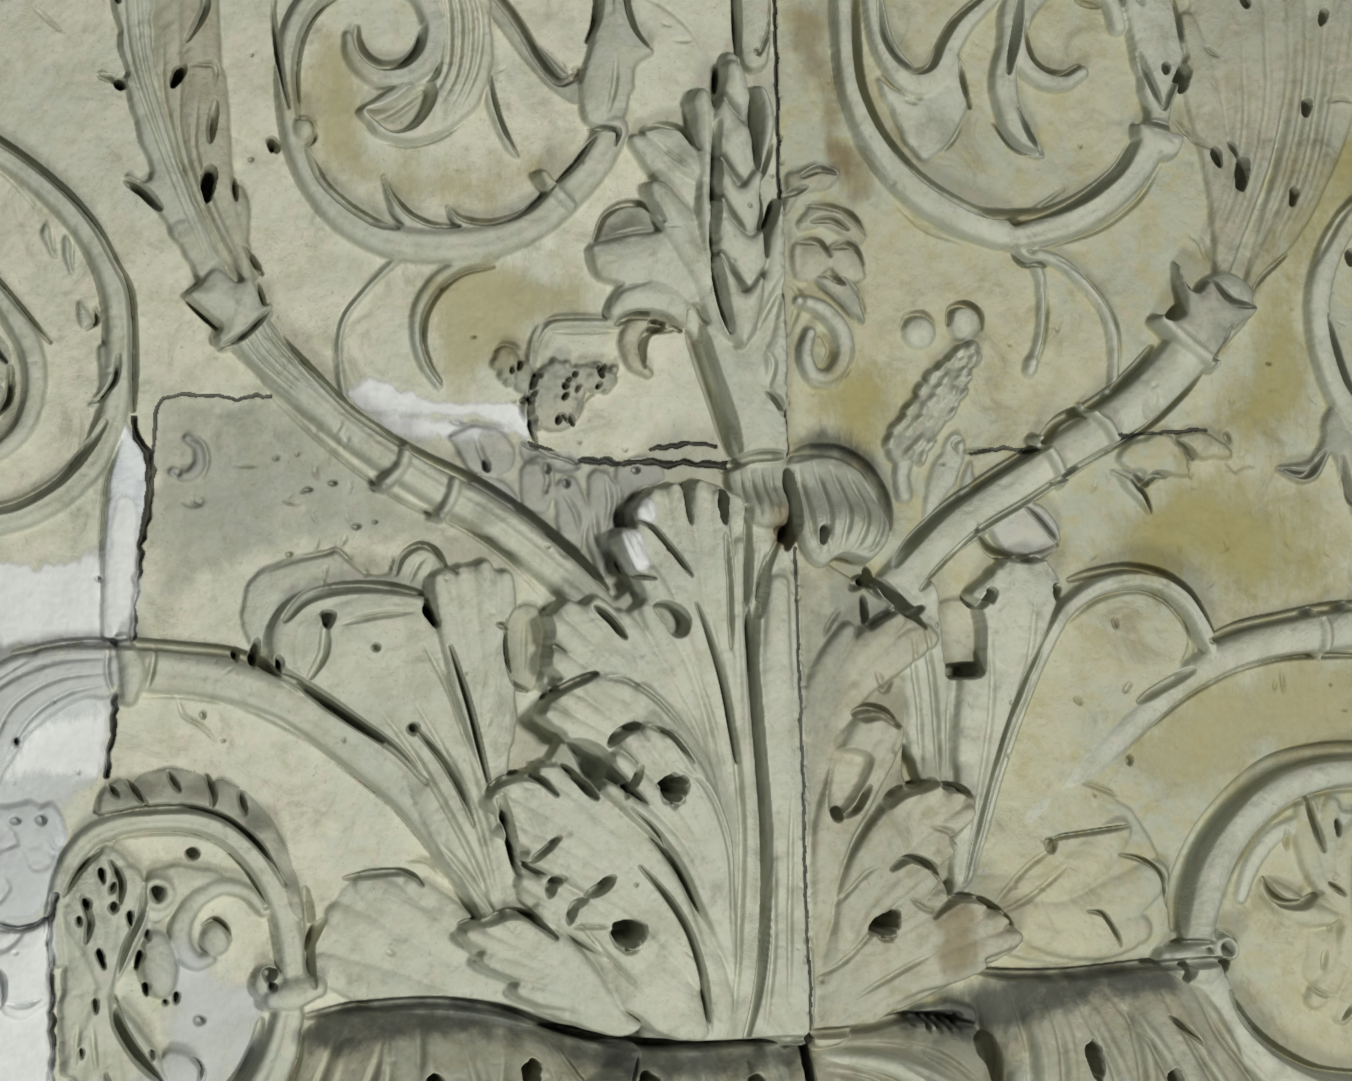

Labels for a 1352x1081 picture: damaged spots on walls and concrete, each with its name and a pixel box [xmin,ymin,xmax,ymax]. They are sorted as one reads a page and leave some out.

crack [127,392,272,642]
crack [527,441,728,470]
crack [103,693,119,779]
crack [0,892,59,1081]